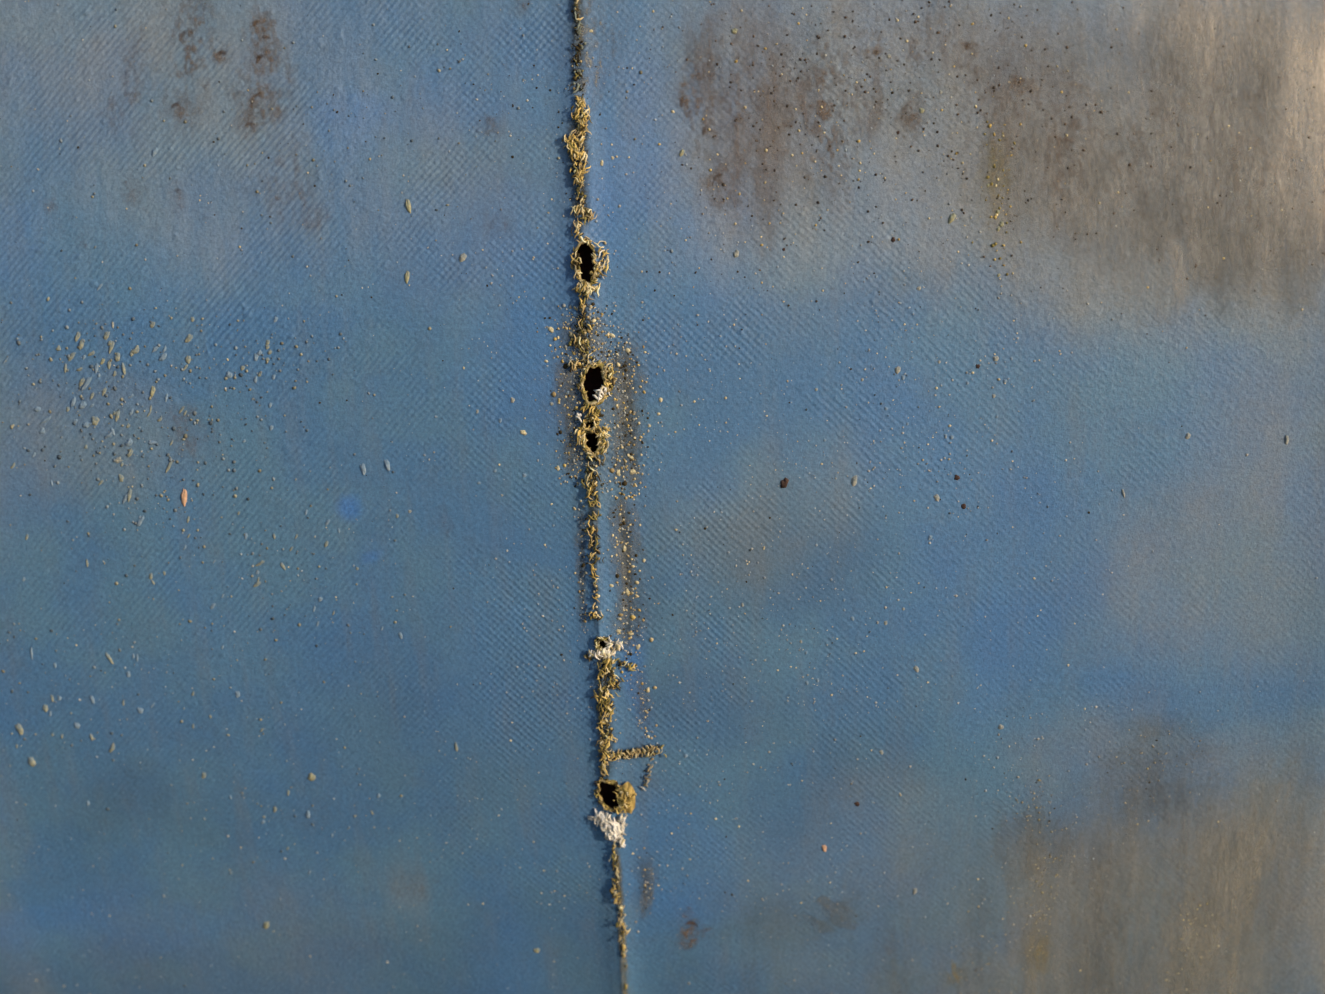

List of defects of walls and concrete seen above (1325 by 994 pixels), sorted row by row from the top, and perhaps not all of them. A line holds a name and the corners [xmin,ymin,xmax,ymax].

crack [562,0,602,243]
water stain [1164,26,1325,279]
crack [568,290,596,363]
crack [580,451,606,621]
crack [591,657,667,791]
crack [609,841,630,994]